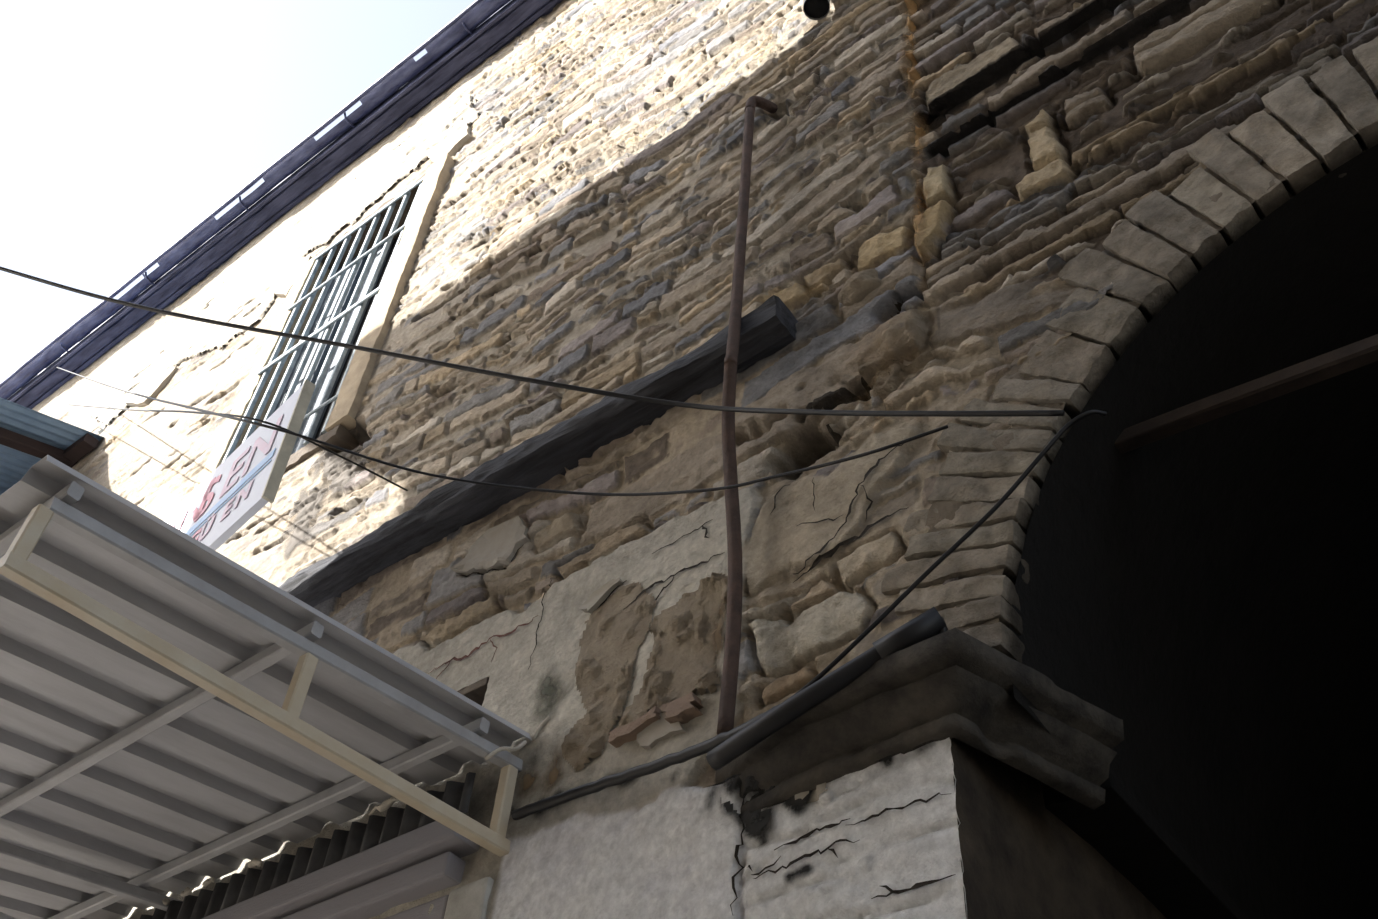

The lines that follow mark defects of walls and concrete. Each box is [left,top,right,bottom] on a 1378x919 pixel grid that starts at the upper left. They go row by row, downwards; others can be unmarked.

flaking render [89,94,481,434]
crack [428,578,552,679]
flaking render [561,572,728,771]
crack [598,519,725,610]
crack [771,444,908,583]
crack [730,793,956,915]